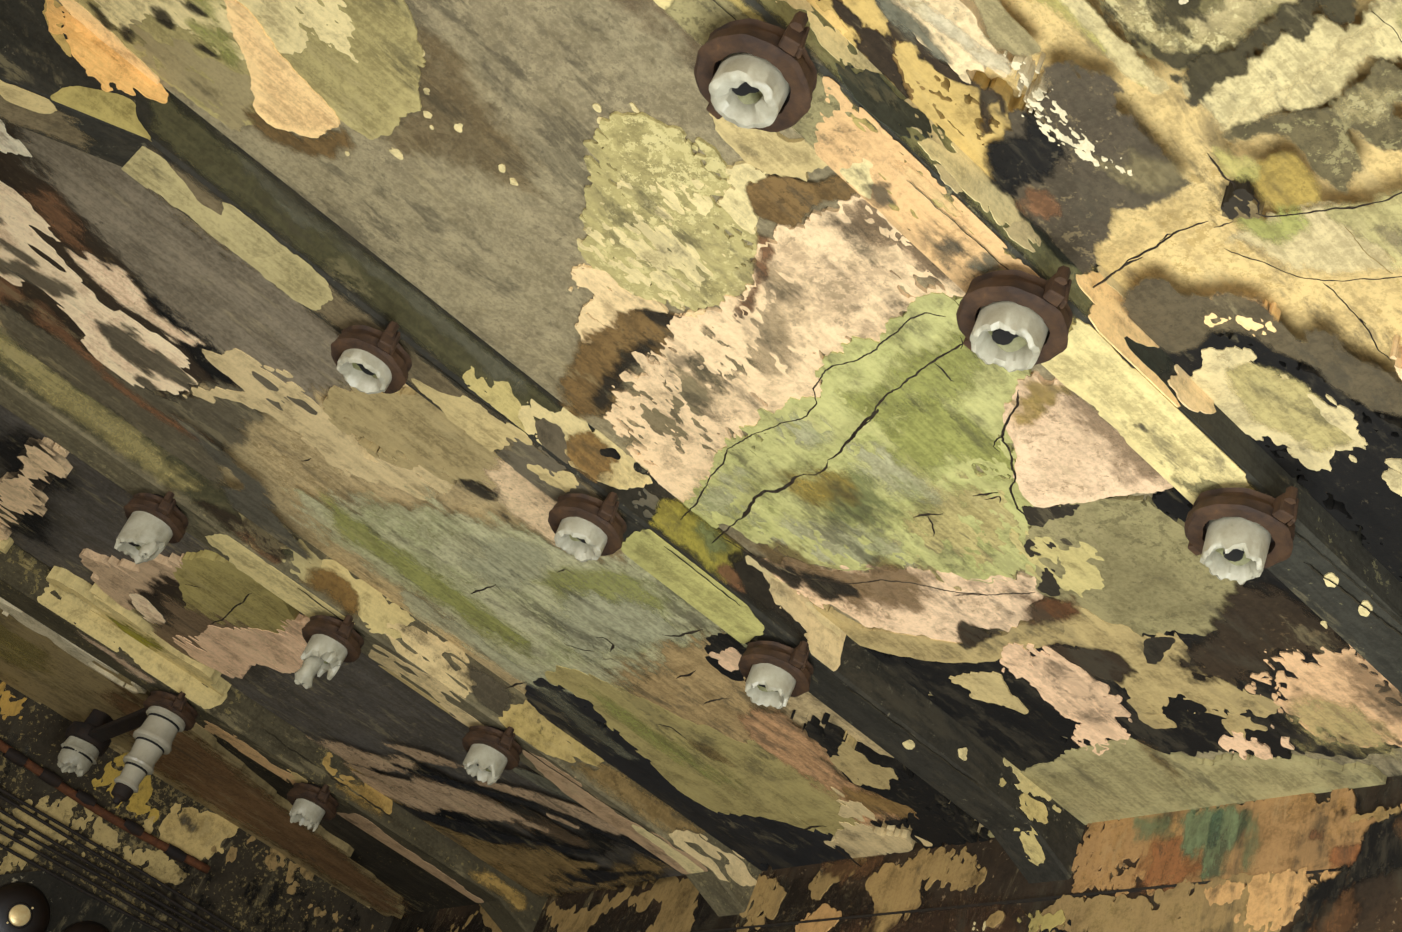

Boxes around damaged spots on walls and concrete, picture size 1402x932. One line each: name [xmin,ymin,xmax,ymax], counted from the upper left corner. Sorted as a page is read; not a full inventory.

crack [1093,153,1402,360]
crack [415,352,522,430]
flaking render [0,0,1041,932]
crack [664,312,1035,606]
peeling [745,266,1402,756]
peeling [999,757,1061,866]
peeling [1034,788,1402,932]